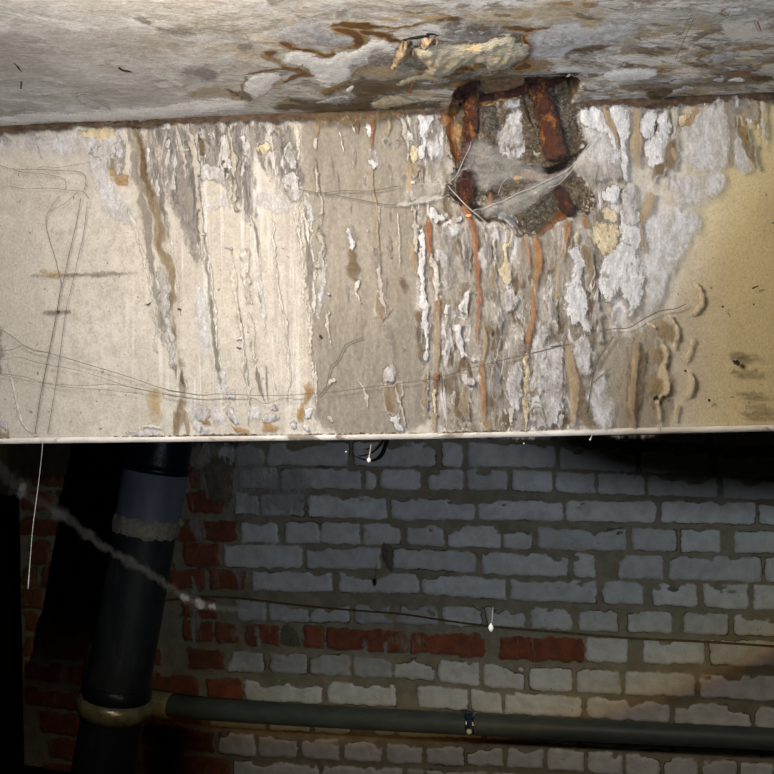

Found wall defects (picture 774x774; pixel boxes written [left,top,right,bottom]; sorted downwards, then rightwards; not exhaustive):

corrosion [240,16,461,100]
corrosion [455,64,482,72]
water stain [441,9,519,43]
spalling [407,29,596,238]
corrosion [502,25,554,72]
water stain [0,22,767,438]
corrosion [453,76,568,431]
corrosion [513,169,589,255]
corrosion [424,219,440,431]
water stain [0,345,82,482]